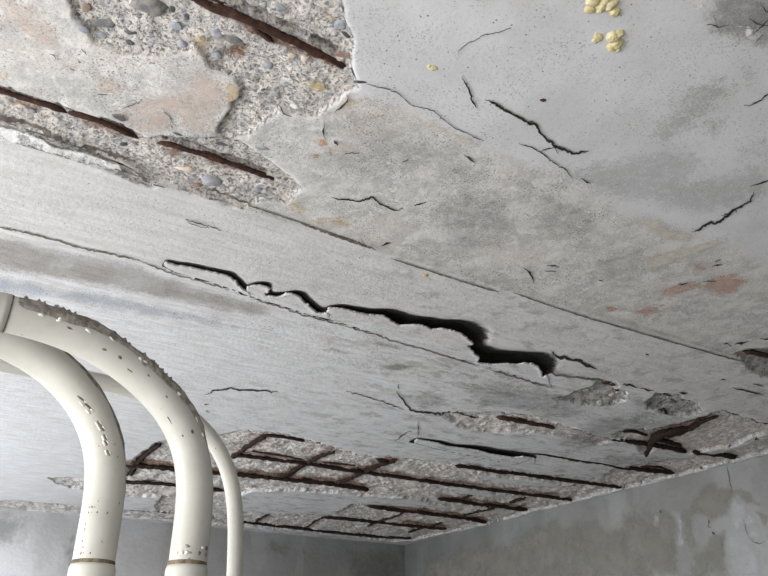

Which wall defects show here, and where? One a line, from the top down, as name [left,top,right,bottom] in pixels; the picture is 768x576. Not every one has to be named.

spalling [0,0,367,210]
crack [462,76,589,183]
crack [335,196,425,211]
crack [695,180,768,232]
crack [161,260,595,387]
crack [204,387,278,413]
crack [351,384,536,464]
spalling [552,380,627,406]
rust [233,433,557,496]
spalling [218,393,768,542]
spalling [0,500,108,514]
rust [376,505,484,528]